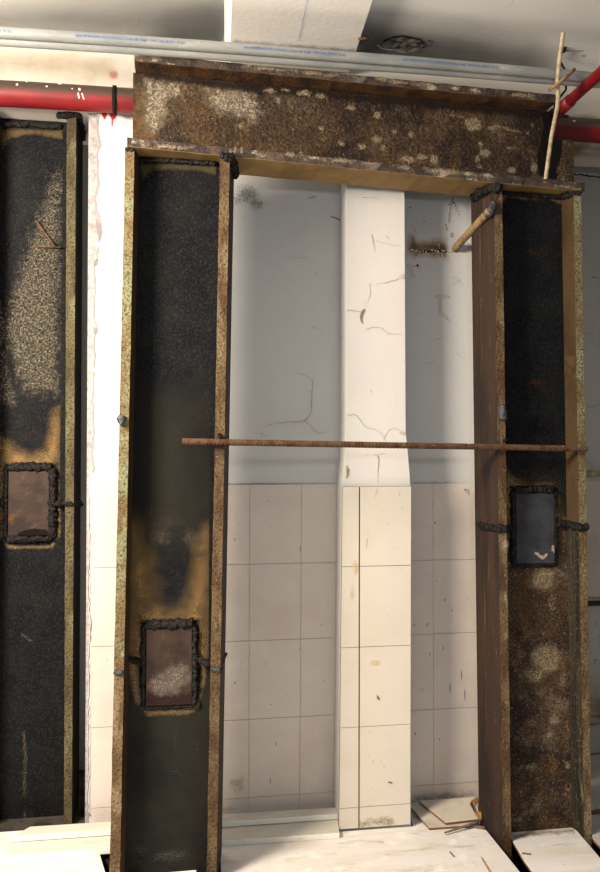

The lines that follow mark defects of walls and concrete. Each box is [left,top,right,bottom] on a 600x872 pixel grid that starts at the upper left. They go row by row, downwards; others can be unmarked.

crack [351,414,405,496]
water stain [129,528,198,715]
water stain [172,573,207,684]